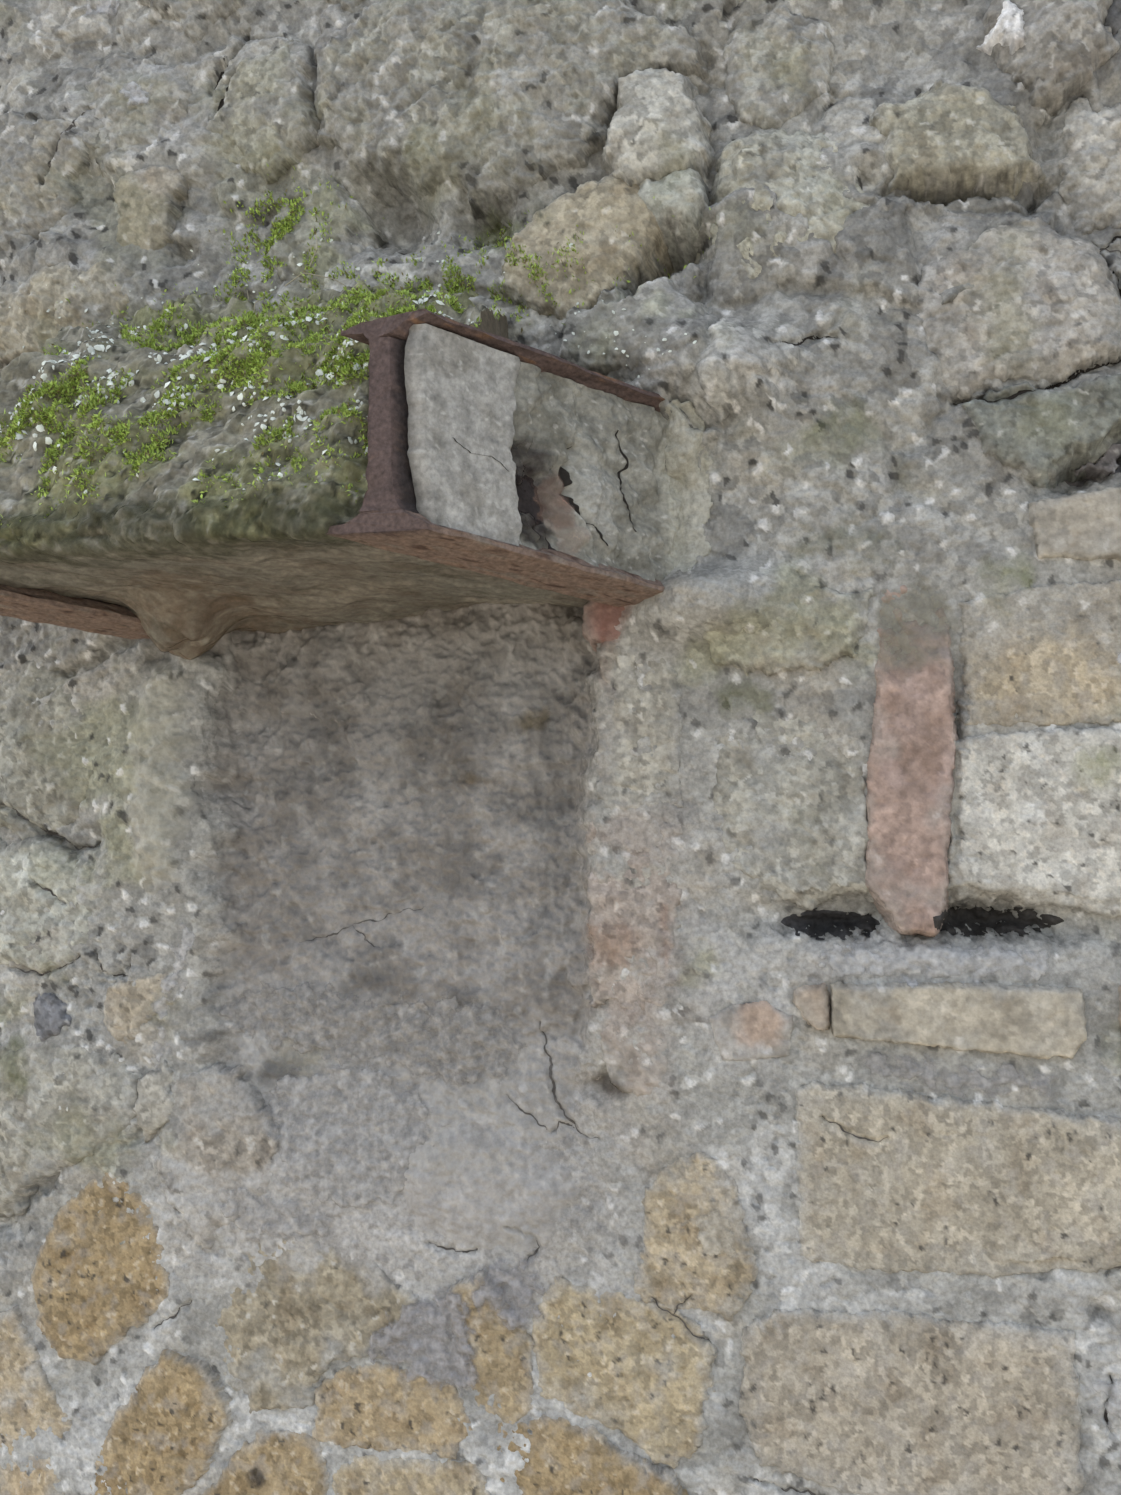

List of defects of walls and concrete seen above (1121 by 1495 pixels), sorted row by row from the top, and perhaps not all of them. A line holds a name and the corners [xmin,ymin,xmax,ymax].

crack [558,430,637,546]
crack [506,1028,598,1139]